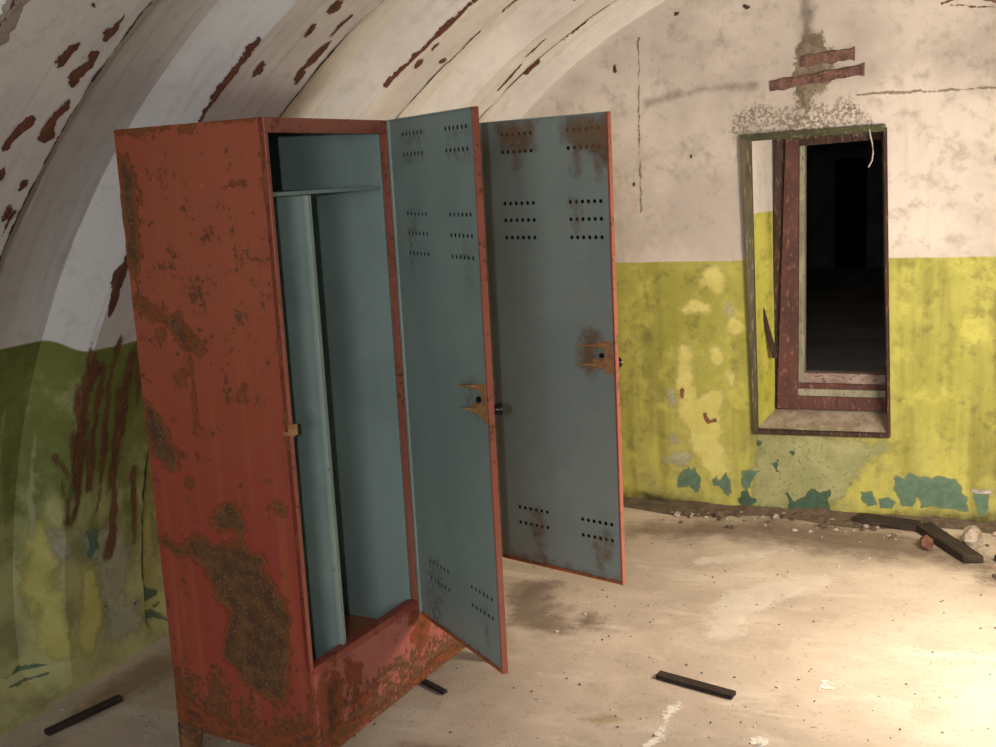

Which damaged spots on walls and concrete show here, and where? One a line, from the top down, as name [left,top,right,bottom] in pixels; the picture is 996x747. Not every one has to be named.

spalling [0,0,30,46]
crack [941,0,996,8]
spalling [497,39,546,91]
spalling [732,31,871,135]
crack [856,86,996,96]
corrosion [52,336,141,561]
peeling [861,473,992,517]